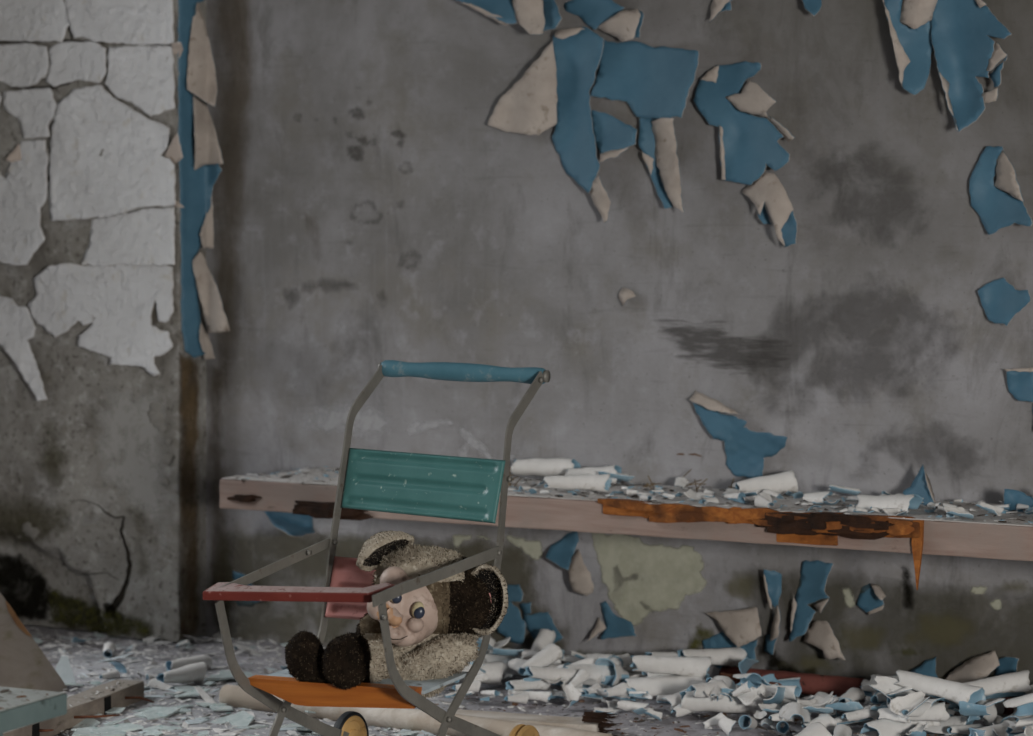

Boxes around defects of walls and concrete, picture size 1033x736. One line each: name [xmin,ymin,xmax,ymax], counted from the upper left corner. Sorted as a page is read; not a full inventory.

peeling [456,0,797,247]
peeling [883,0,1012,132]
peeling [0,0,230,401]
peeling [969,146,1033,235]
peeling [978,277,1031,326]
peeling [1004,368,1033,411]
crack [72,500,132,611]
peeling [689,390,924,516]
peeling [944,502,1011,519]
flaking render [452,531,1033,736]